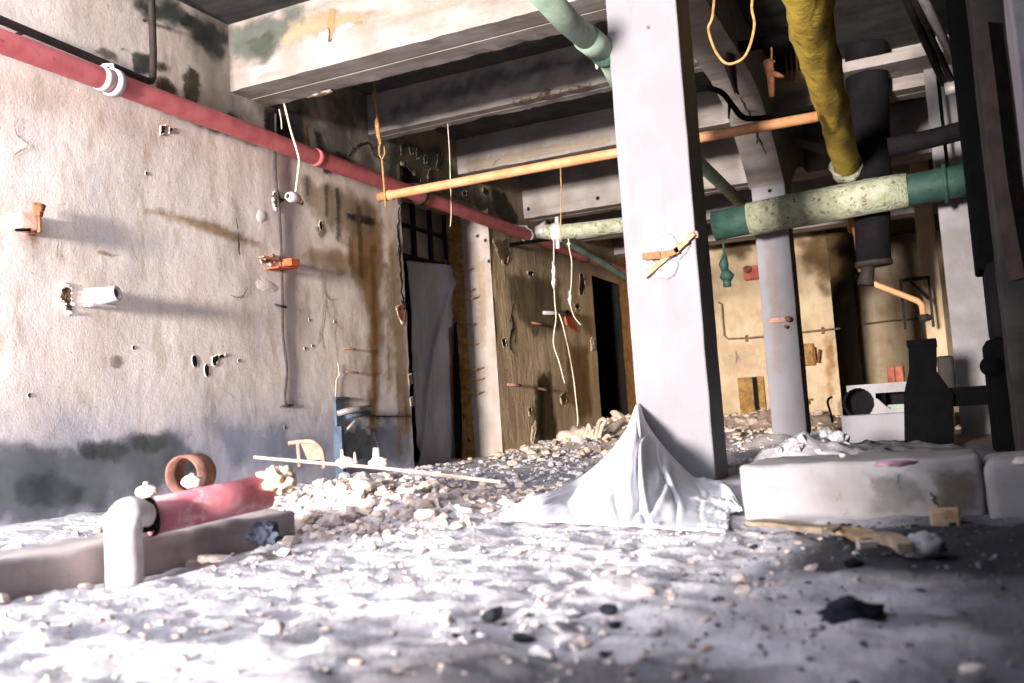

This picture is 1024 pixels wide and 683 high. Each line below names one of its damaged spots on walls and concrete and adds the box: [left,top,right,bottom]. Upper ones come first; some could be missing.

leakage [134,0,366,81]
leakage [96,48,200,103]
leakage [264,109,351,162]
spalling [400,142,443,185]
leakage [303,169,374,241]
spalling [57,282,75,316]
corrosion [309,206,390,427]
spalling [191,353,240,377]
leakage [223,427,307,465]
leakage [0,432,196,523]